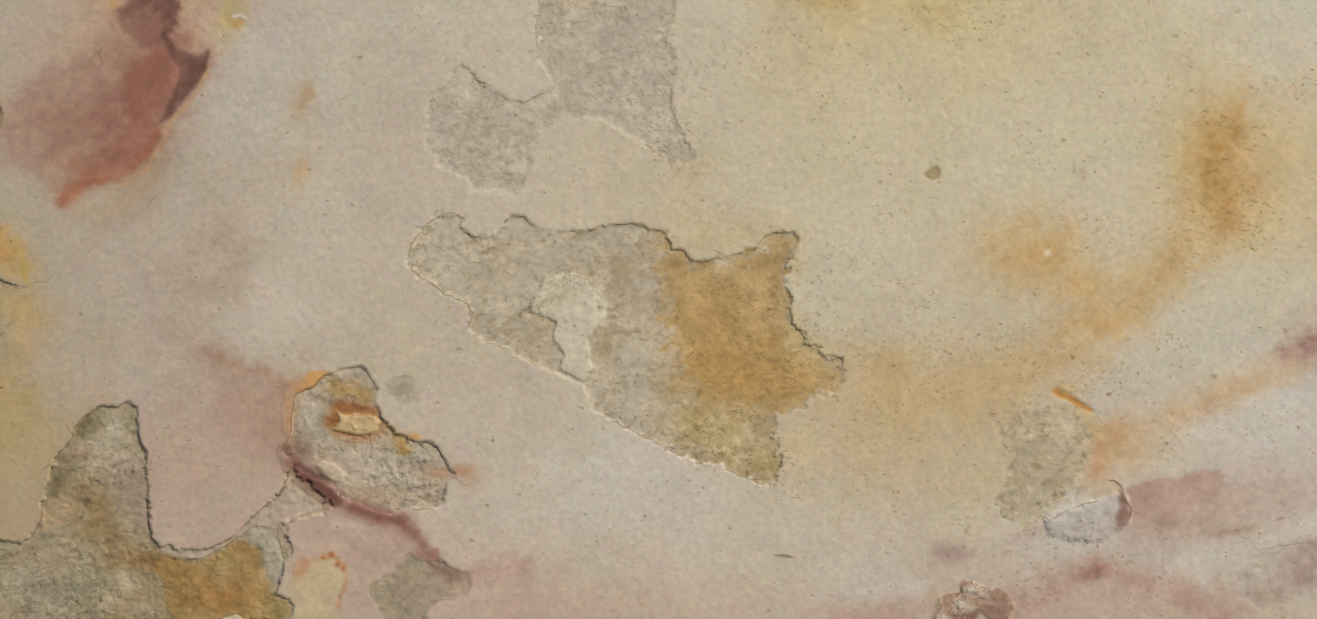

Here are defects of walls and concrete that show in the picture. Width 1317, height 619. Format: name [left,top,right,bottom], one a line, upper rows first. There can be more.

leakage [0,0,256,232]
peeling [423,0,709,197]
spalling [0,365,466,619]
peeling [405,212,859,493]
leakage [780,165,1317,619]
corrosion [953,57,1311,497]